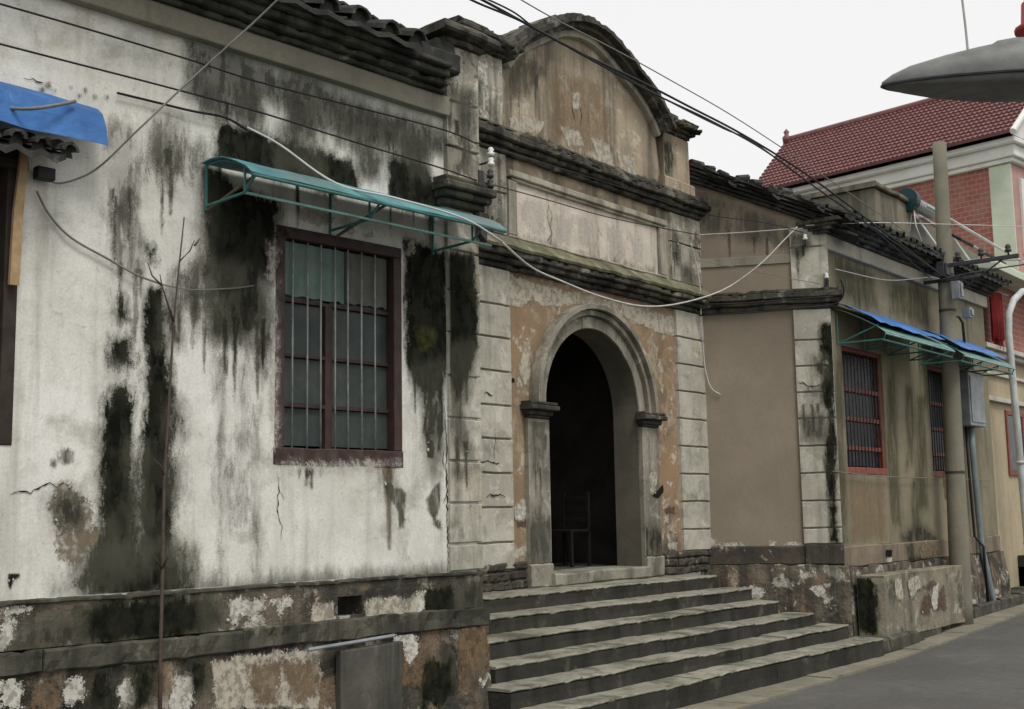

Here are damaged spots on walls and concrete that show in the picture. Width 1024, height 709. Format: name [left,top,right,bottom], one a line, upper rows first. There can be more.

flaking render [509,274,674,336]
water stain [27,79,483,647]
water stain [801,323,838,543]
crack [10,482,88,504]
flaking render [649,471,678,551]
flaking render [0,605,35,650]
flaking render [223,594,294,628]
flaking render [311,602,336,622]
flaking render [364,590,427,616]
flaking render [895,575,947,616]
flaking render [0,678,26,709]
flaking render [210,648,323,709]